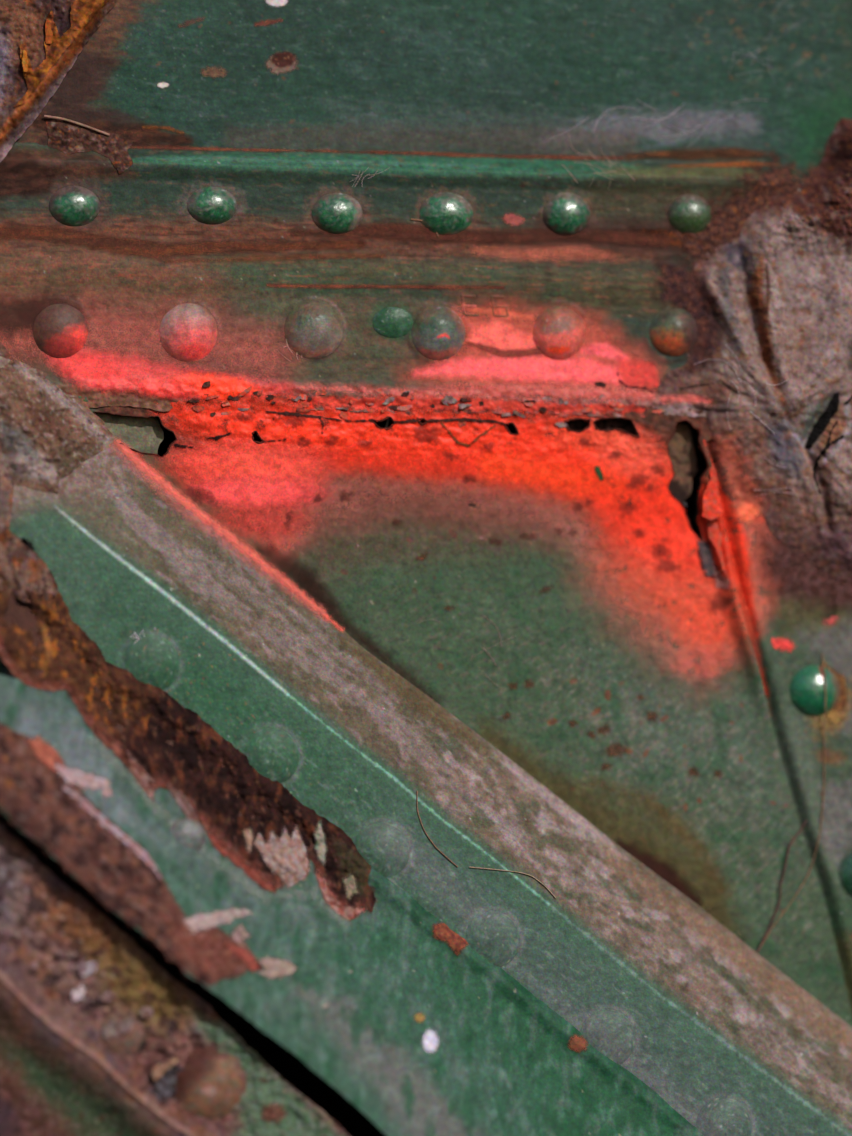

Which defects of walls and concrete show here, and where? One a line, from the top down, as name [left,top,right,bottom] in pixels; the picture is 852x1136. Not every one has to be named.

rust [14,0,109,107]
rust [34,117,58,129]
rust [188,381,326,423]
rust [336,388,414,419]
rust [429,396,484,427]
rust [501,395,569,428]
rust [581,382,624,415]
crack [174,433,231,448]
crack [264,411,505,447]
rust [268,555,387,661]